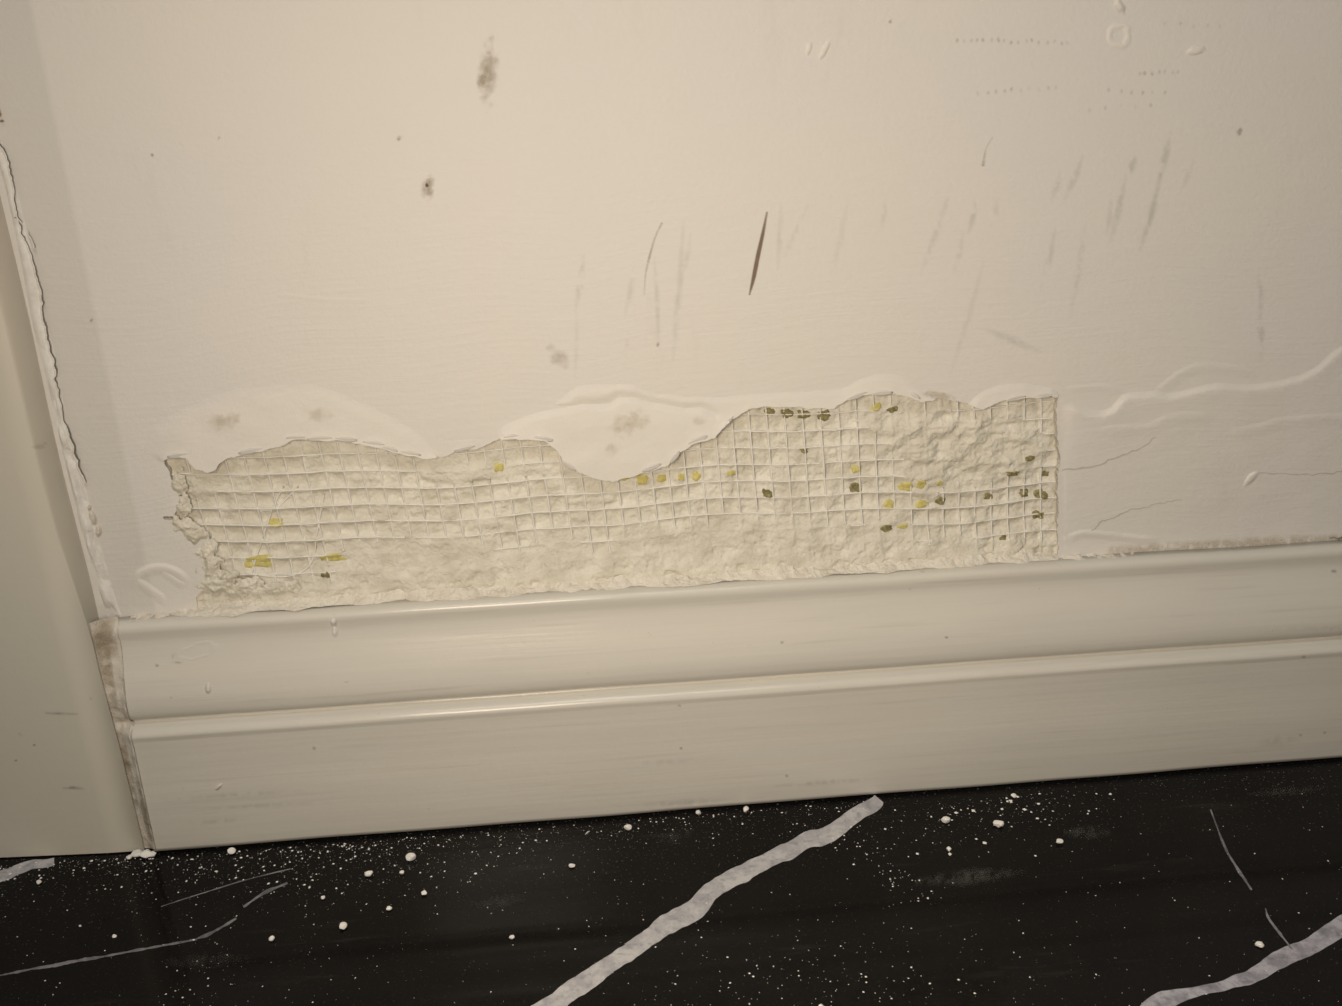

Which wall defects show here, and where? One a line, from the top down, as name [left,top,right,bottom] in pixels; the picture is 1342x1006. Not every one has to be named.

crack [0,144,86,483]
flaking render [167,345,1342,609]
crack [1062,437,1156,471]